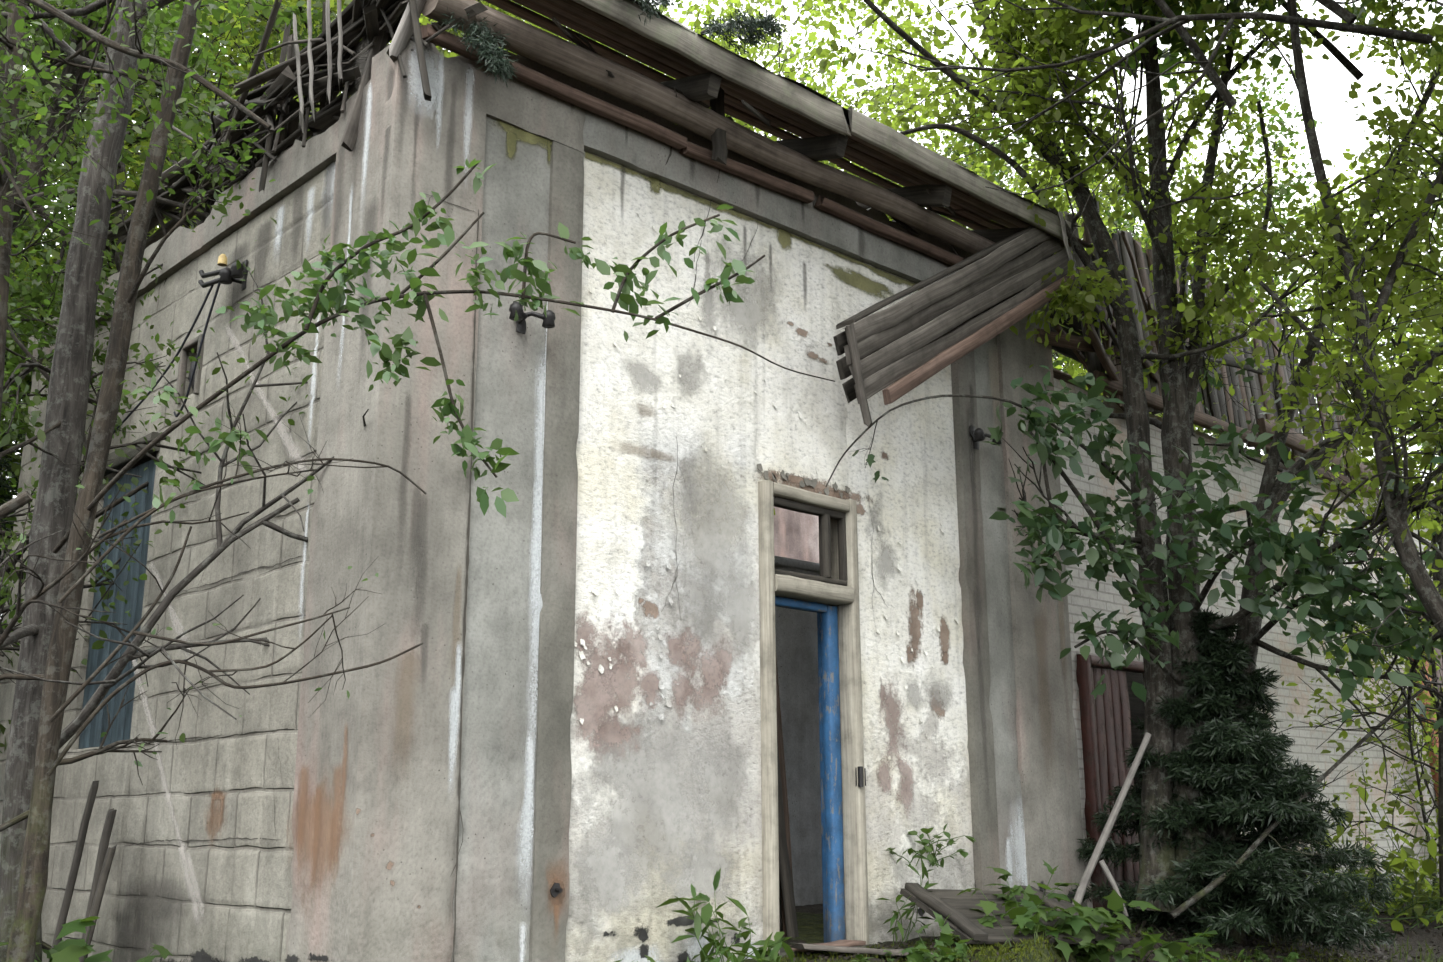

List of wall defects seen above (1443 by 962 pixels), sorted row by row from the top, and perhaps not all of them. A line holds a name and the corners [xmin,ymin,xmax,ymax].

leakage [412,51,443,121]
leakage [311,318,319,410]
leakage [532,329,547,656]
spalling [757,463,881,531]
peeling [876,540,959,809]
leakage [523,739,533,856]
peeling [573,597,745,910]
peeling [239,954,299,962]